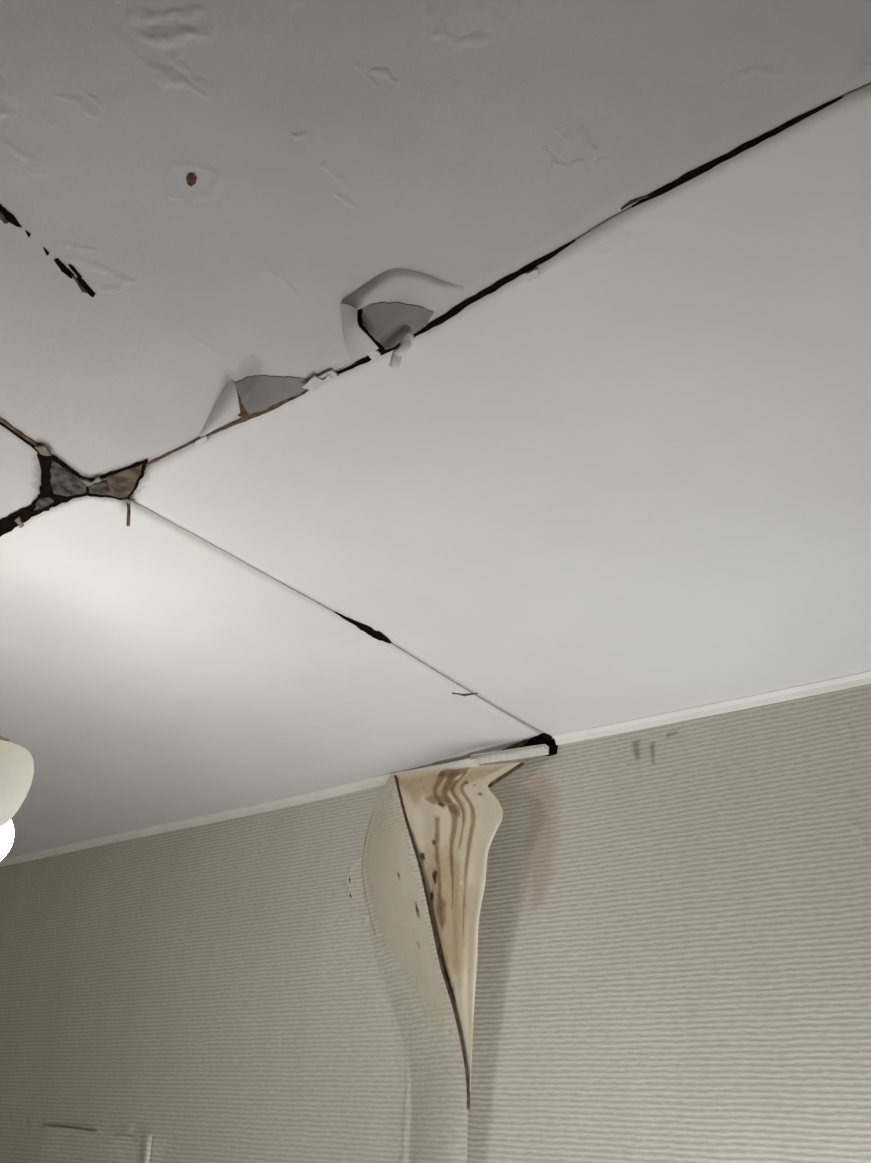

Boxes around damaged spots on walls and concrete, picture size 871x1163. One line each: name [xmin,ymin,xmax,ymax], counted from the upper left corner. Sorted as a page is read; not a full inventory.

peeling [341,268,465,369]
crack [146,83,871,466]
crack [0,418,40,452]
peeling [199,374,332,437]
spalling [0,445,148,537]
crack [133,501,544,733]